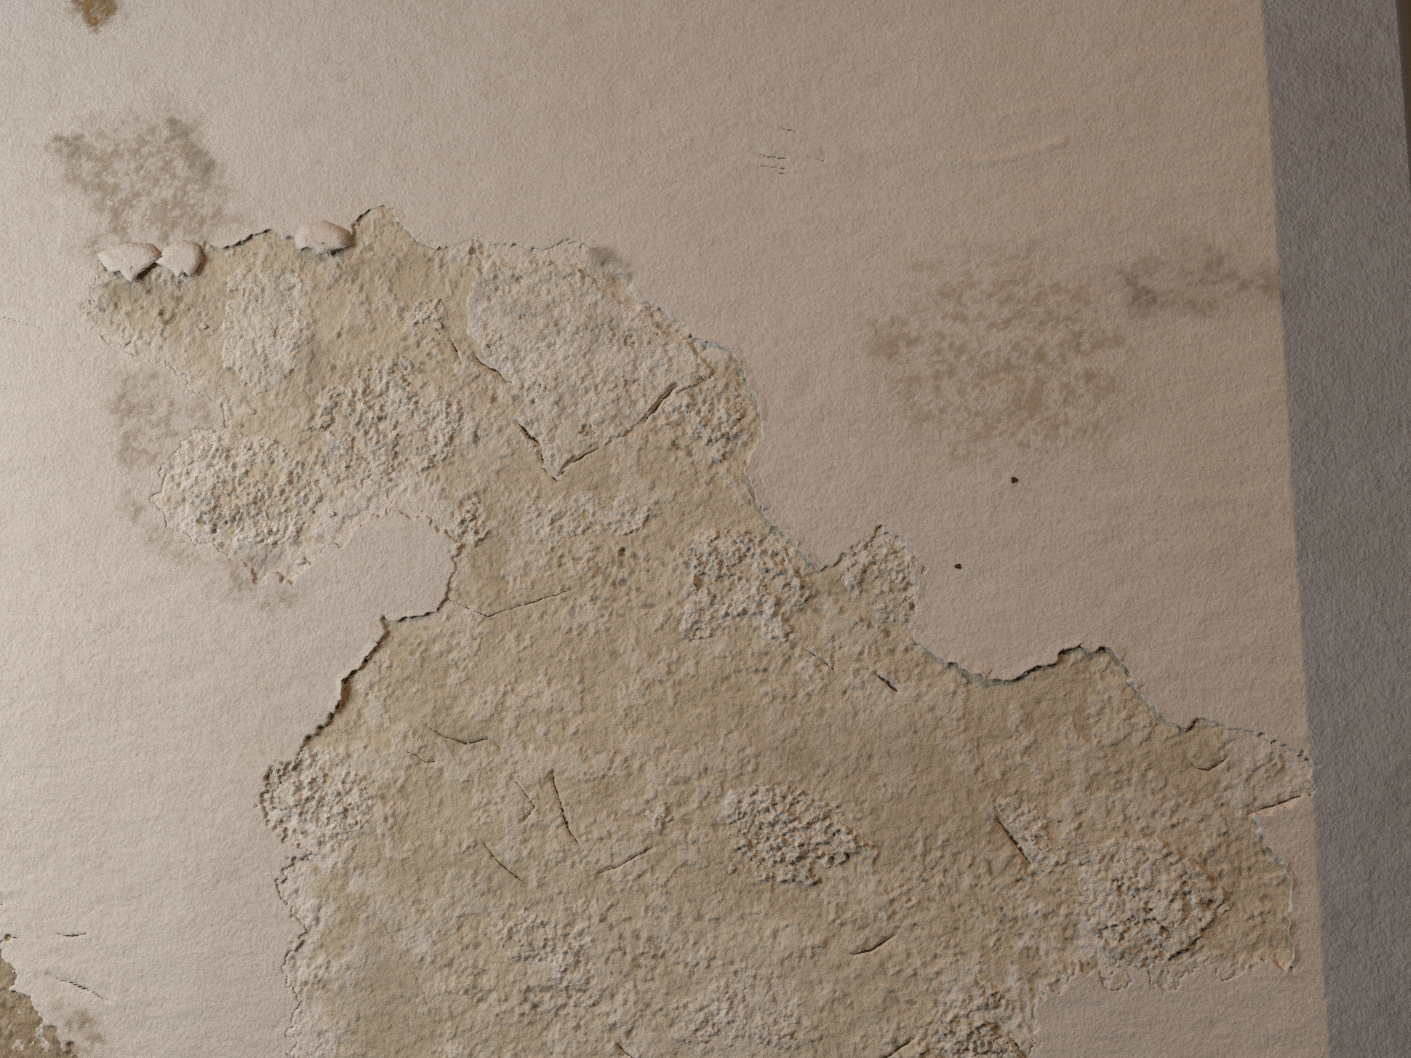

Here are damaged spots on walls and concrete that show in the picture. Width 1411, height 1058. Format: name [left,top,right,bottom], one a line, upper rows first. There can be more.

spalling [0,934,78,1058]
spalling [81,199,1318,1058]